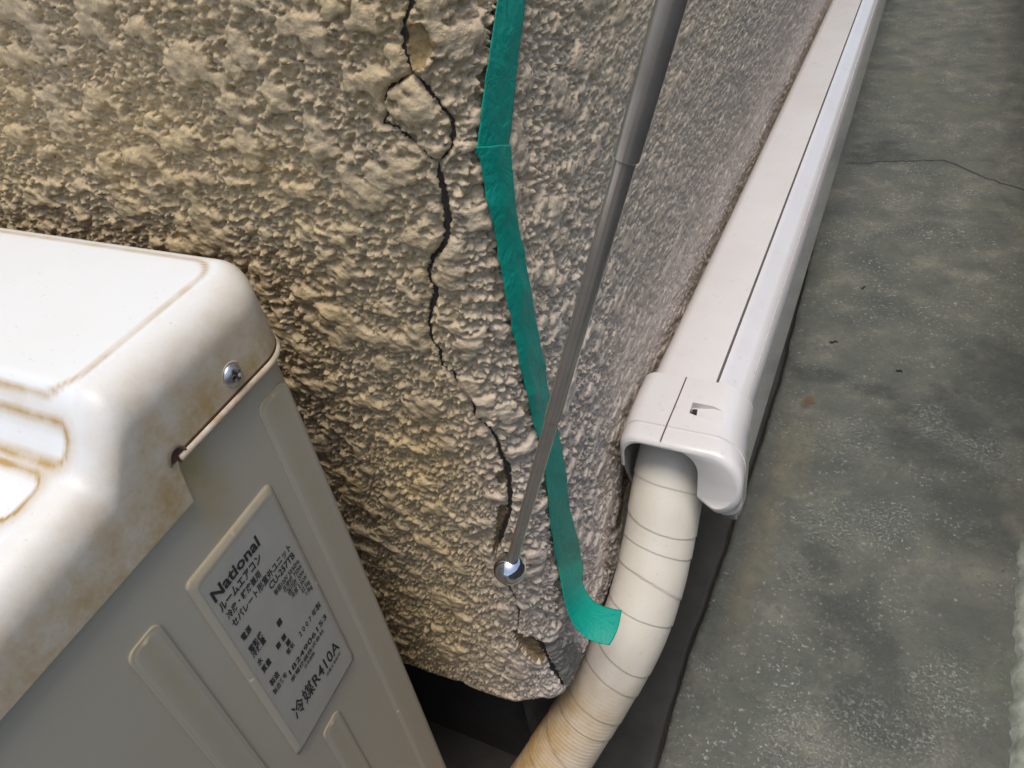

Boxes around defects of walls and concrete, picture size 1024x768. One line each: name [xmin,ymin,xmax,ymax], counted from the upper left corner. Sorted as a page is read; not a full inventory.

crack [383,0,513,555]
spalling [512,630,546,665]
crack [509,586,564,685]